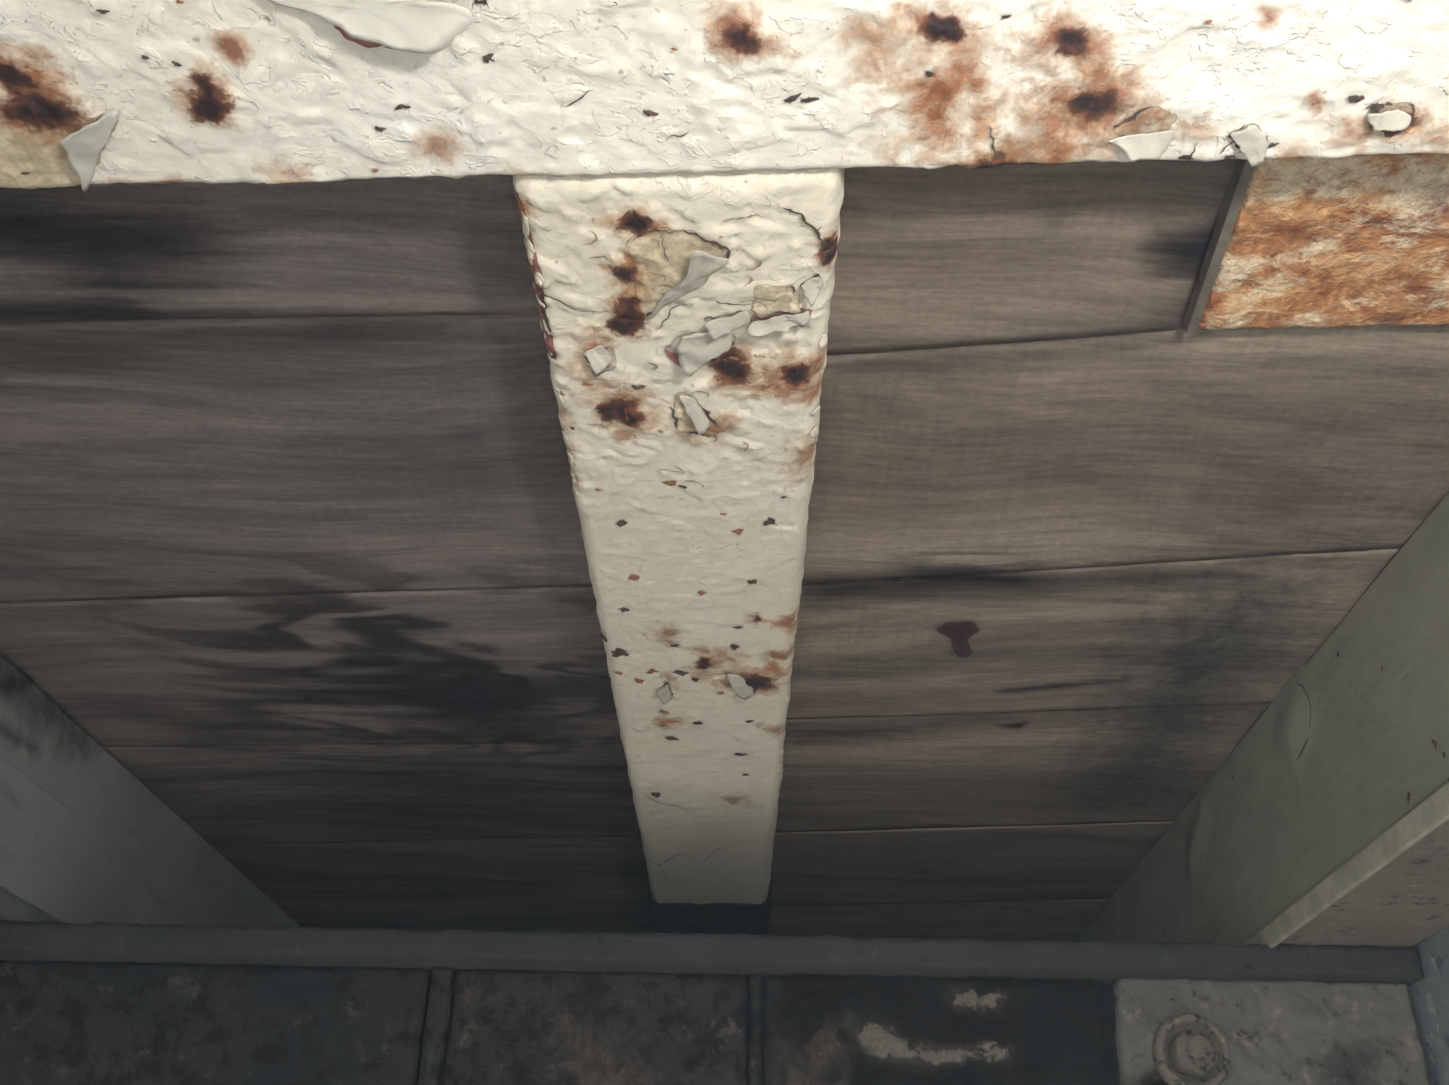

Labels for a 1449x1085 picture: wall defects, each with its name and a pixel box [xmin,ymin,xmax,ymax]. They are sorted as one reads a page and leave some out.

peeling [267,0,488,54]
corrosion [709,9,774,60]
corrosion [0,52,86,144]
peeling [0,109,119,192]
corrosion [184,72,236,126]
corrosion [843,10,987,147]
corrosion [947,15,1161,169]
peeling [1348,95,1415,137]
leakage [0,207,207,288]
leakage [0,304,135,320]
peeling [658,274,824,438]
leakage [196,591,590,744]